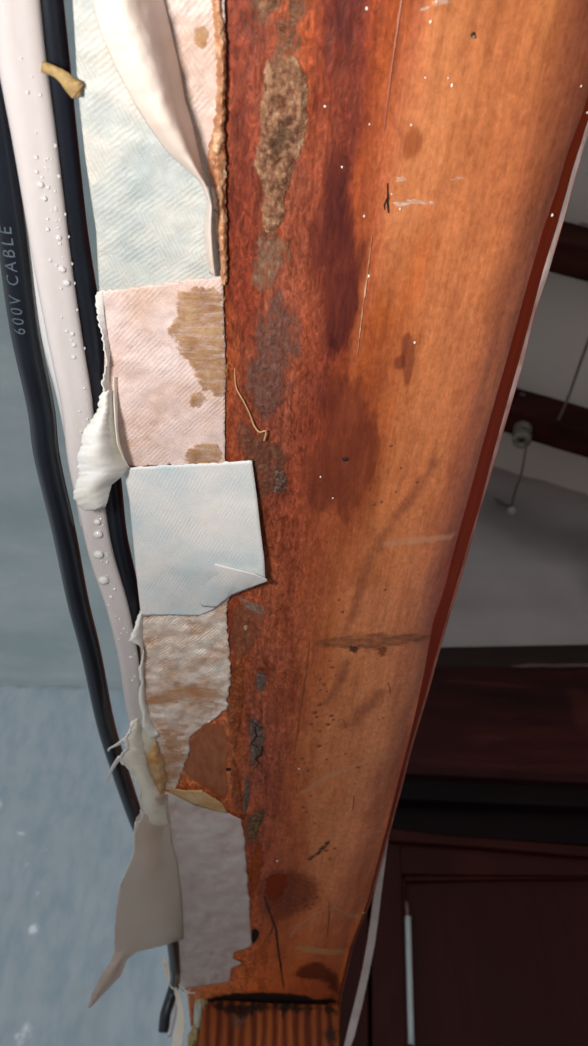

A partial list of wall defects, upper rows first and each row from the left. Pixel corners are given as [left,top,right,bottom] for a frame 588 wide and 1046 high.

peeling [92,0,217,277]
peeling [183,724,229,798]
spalling [242,718,265,842]
leakage [249,843,318,918]